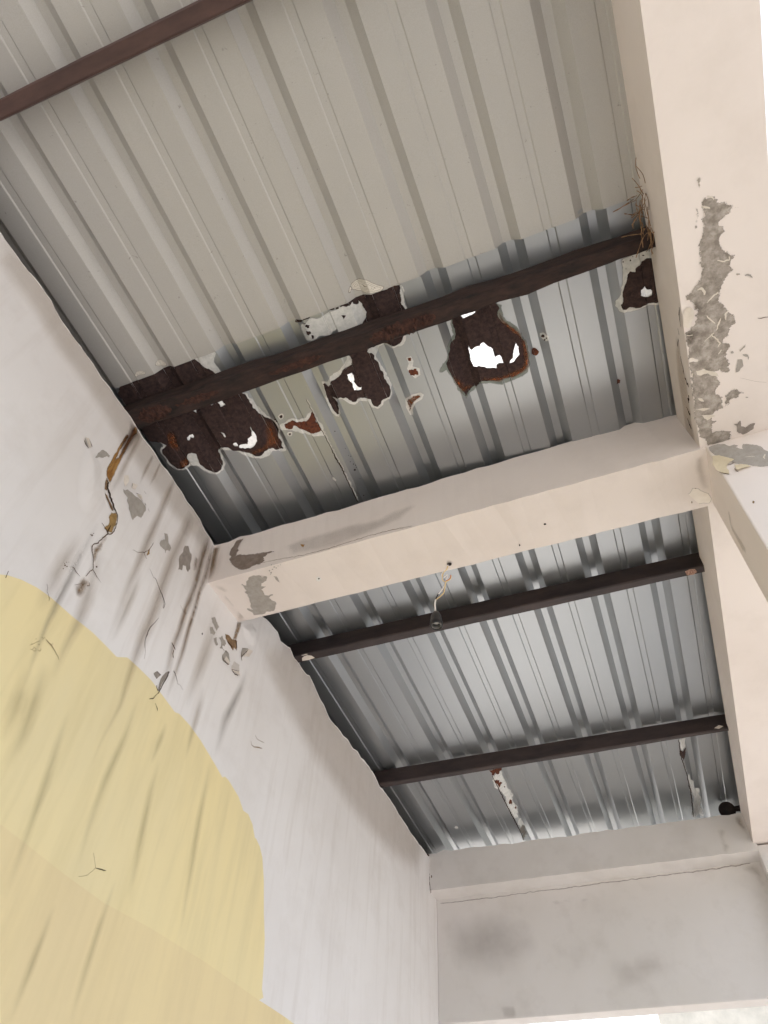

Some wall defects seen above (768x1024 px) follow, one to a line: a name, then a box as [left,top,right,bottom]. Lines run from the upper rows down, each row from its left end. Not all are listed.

rust [118,352,221,405]
rust [295,284,407,341]
rust [321,335,420,417]
rust [440,303,549,397]
rust [615,251,659,313]
peeling [683,196,768,474]
rust [107,393,364,502]
crack [73,479,118,586]
peeling [123,475,146,520]
peeling [229,539,281,615]
peeling [210,617,253,676]
rust [489,768,528,840]